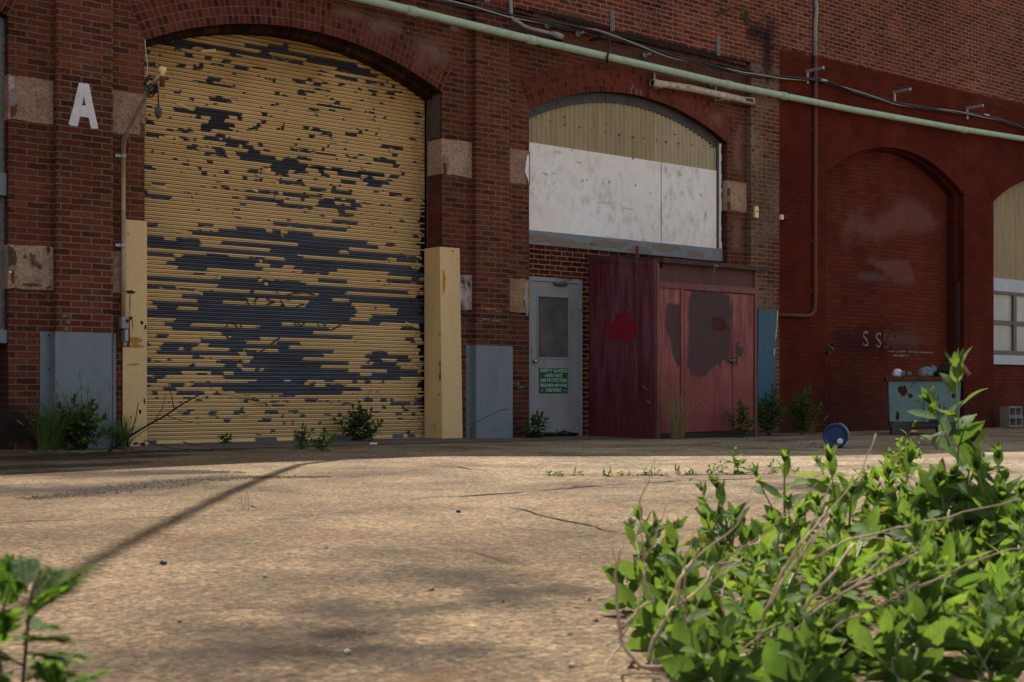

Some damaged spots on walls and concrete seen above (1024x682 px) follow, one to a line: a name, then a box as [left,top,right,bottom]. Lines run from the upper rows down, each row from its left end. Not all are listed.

peeling [140,40,447,442]